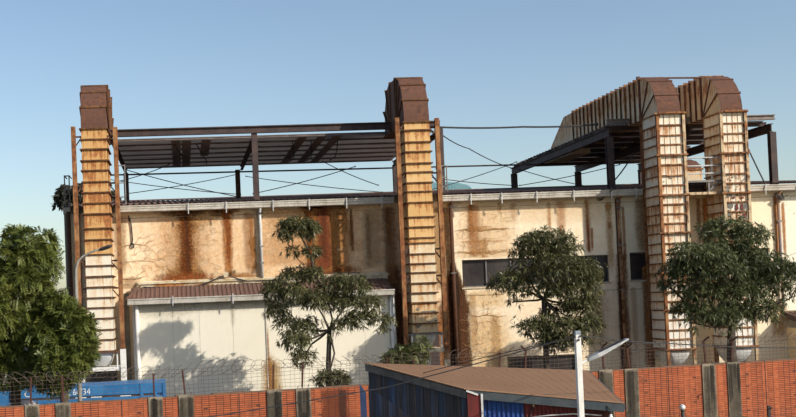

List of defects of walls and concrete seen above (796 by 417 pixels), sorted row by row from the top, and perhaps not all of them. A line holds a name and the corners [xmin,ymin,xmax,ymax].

crack [116,217,224,281]
corrosion [155,210,213,287]
corrosion [221,209,255,278]
corrosion [301,206,359,274]
corrosion [468,205,486,257]
corrosion [585,200,593,251]
corrosion [697,198,709,241]